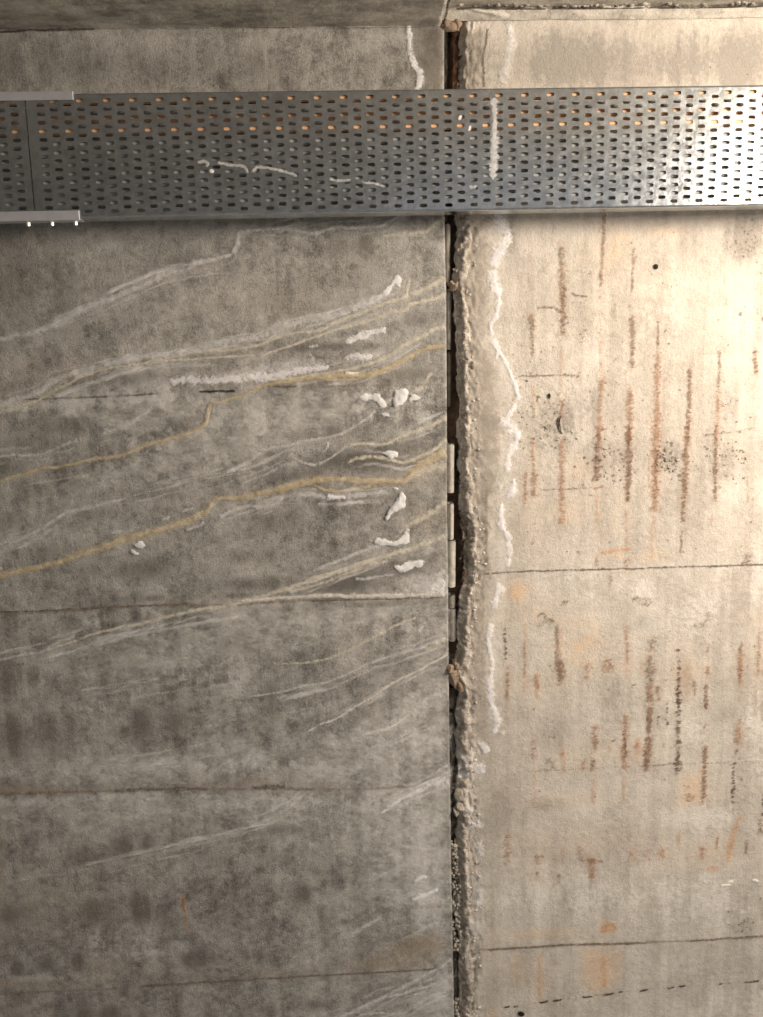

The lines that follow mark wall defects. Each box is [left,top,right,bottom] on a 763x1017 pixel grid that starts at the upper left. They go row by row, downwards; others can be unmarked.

water stain [407,26,424,90]
corrosion [529,247,587,360]
corrosion [626,306,636,368]
water stain [381,214,521,813]
corrosion [524,381,617,523]
corrosion [624,321,671,510]
corrosion [679,369,692,553]
corrosion [705,425,741,500]
water stain [4,535,445,659]
corrosion [553,627,566,681]
corrosion [612,639,684,774]
corrosion [686,745,708,802]